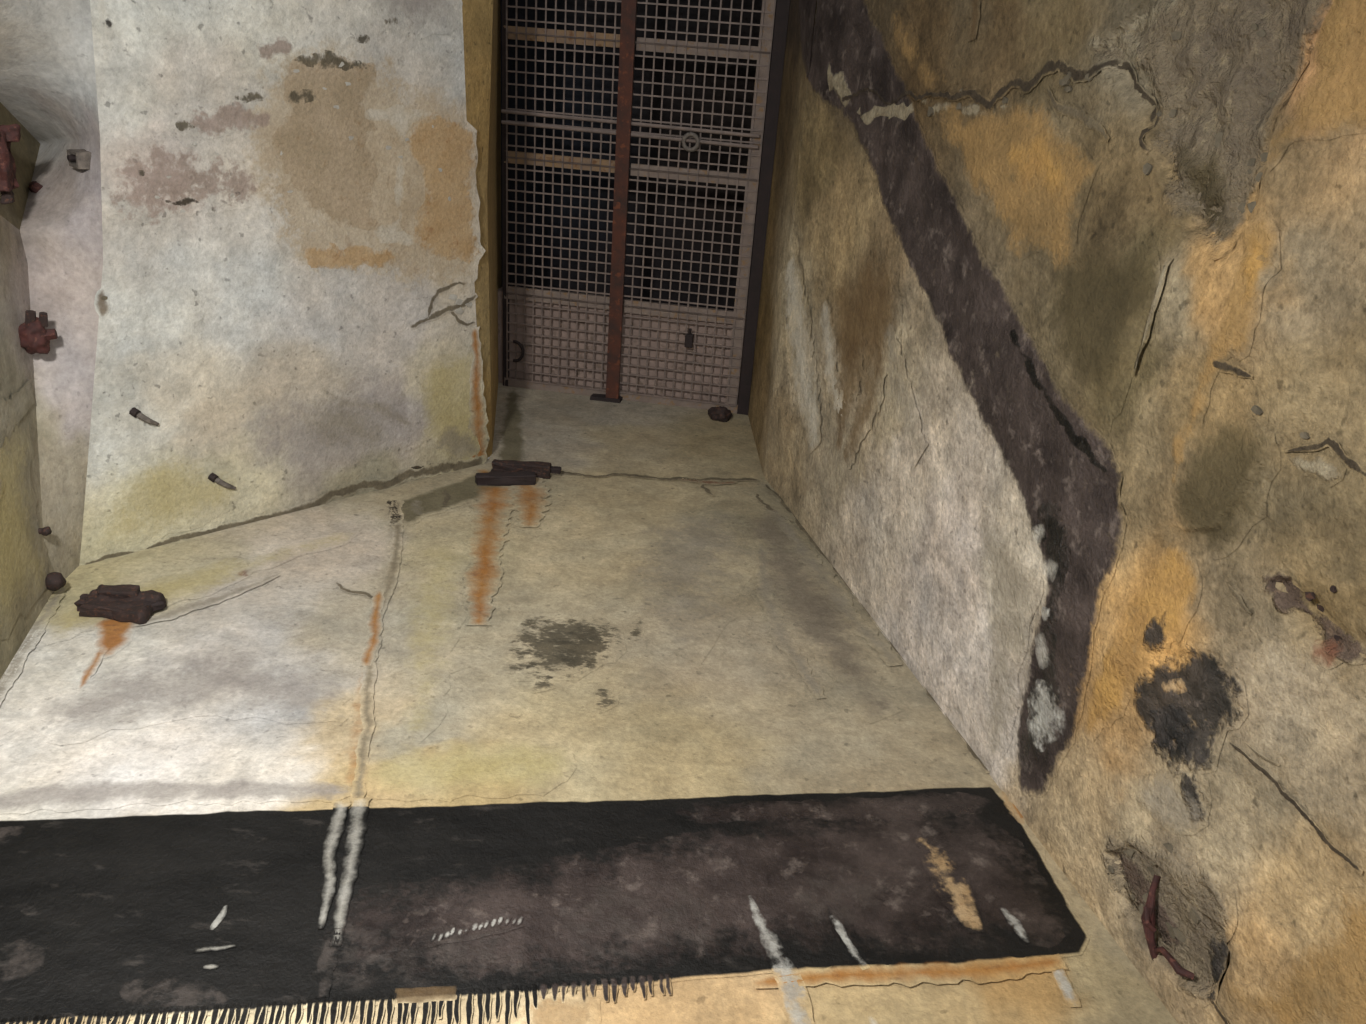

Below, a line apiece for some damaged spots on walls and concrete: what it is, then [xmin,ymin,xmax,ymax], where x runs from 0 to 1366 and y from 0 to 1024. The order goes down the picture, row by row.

damp [230,23,479,304]
crack [408,281,478,329]
damp [469,185,481,240]
crack [827,57,1161,154]
corrosion [77,618,137,690]
crack [82,455,487,804]
damp [0,529,577,998]
corrosion [461,327,551,625]
damp [503,492,902,724]
damp [977,216,1281,835]
spalling [1098,828,1238,1007]